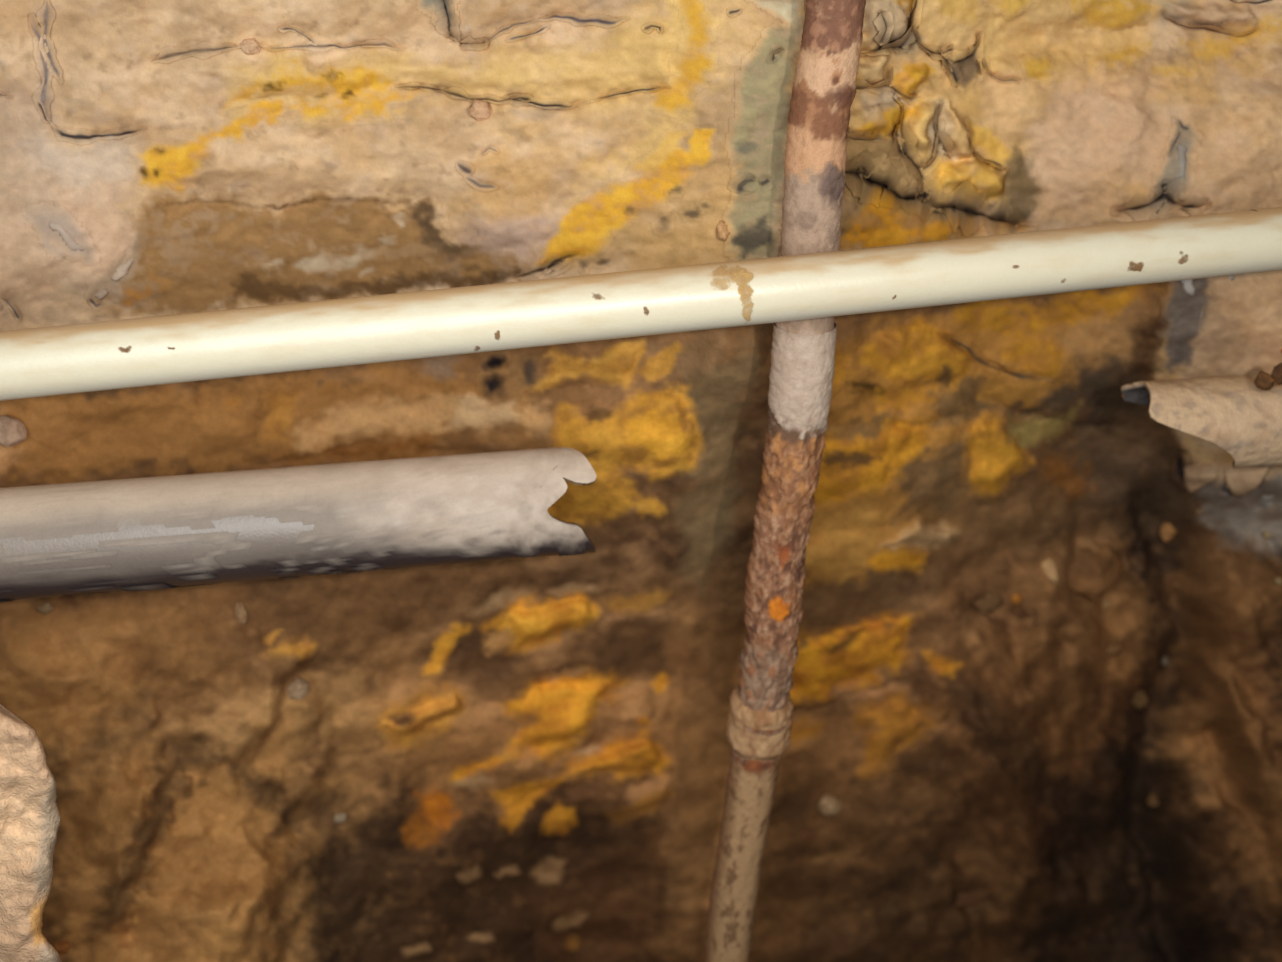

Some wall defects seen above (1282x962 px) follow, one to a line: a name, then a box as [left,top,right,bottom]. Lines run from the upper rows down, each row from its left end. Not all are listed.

crack [0,0,146,145]
crack [152,25,406,63]
water stain [91,0,805,321]
crack [391,82,671,110]
crack [434,0,663,50]
crack [1110,119,1212,221]
water stain [476,336,710,531]
water stain [805,283,1165,587]
water stain [367,579,679,888]
water stain [788,606,967,784]
water stain [397,938,433,961]
water stain [462,928,498,945]